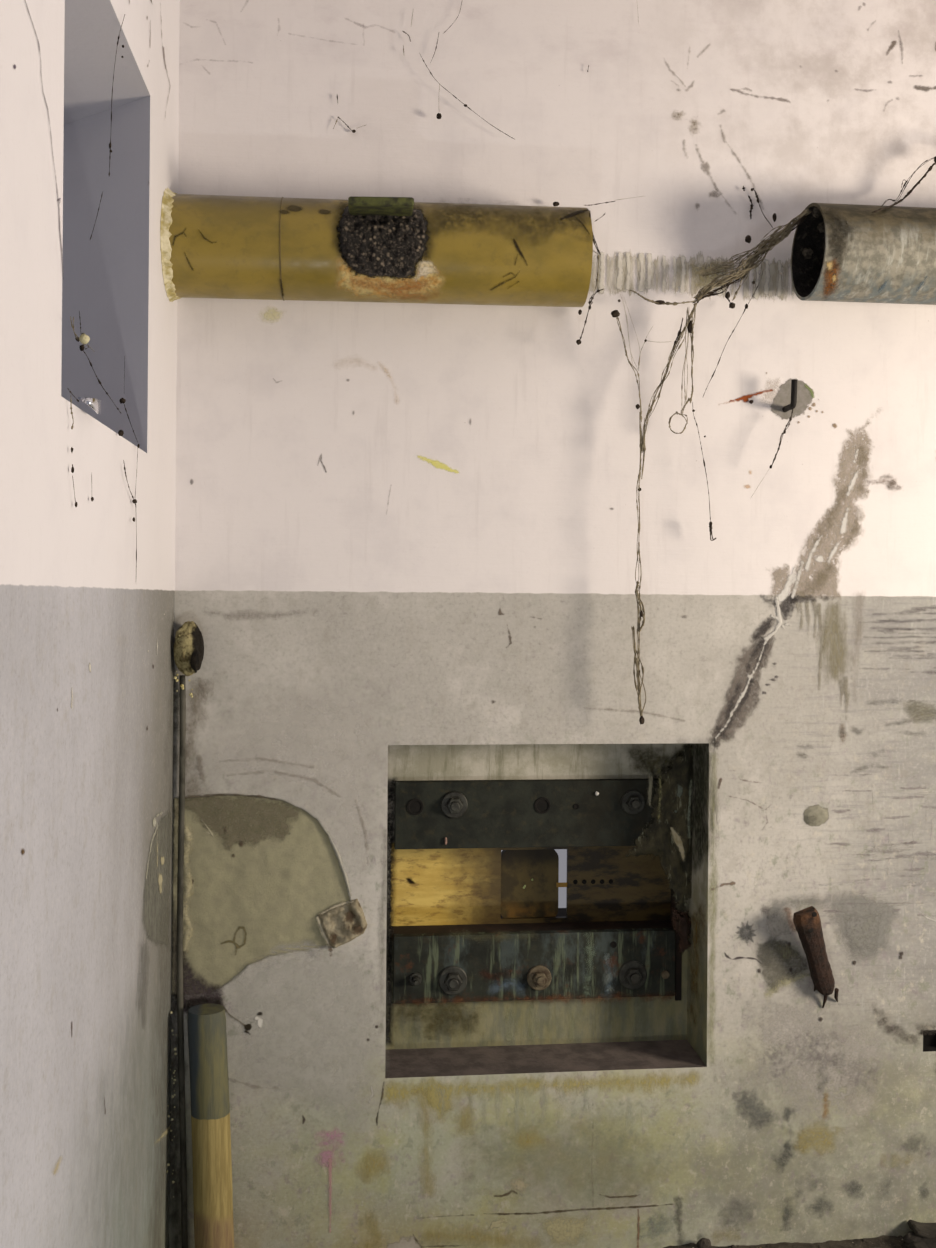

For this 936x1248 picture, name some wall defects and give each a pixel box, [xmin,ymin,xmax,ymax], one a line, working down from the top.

damp [773,423,900,702]
spalling [144,795,362,1034]
damp [387,1074,695,1124]
corrosion [814,983,839,1008]